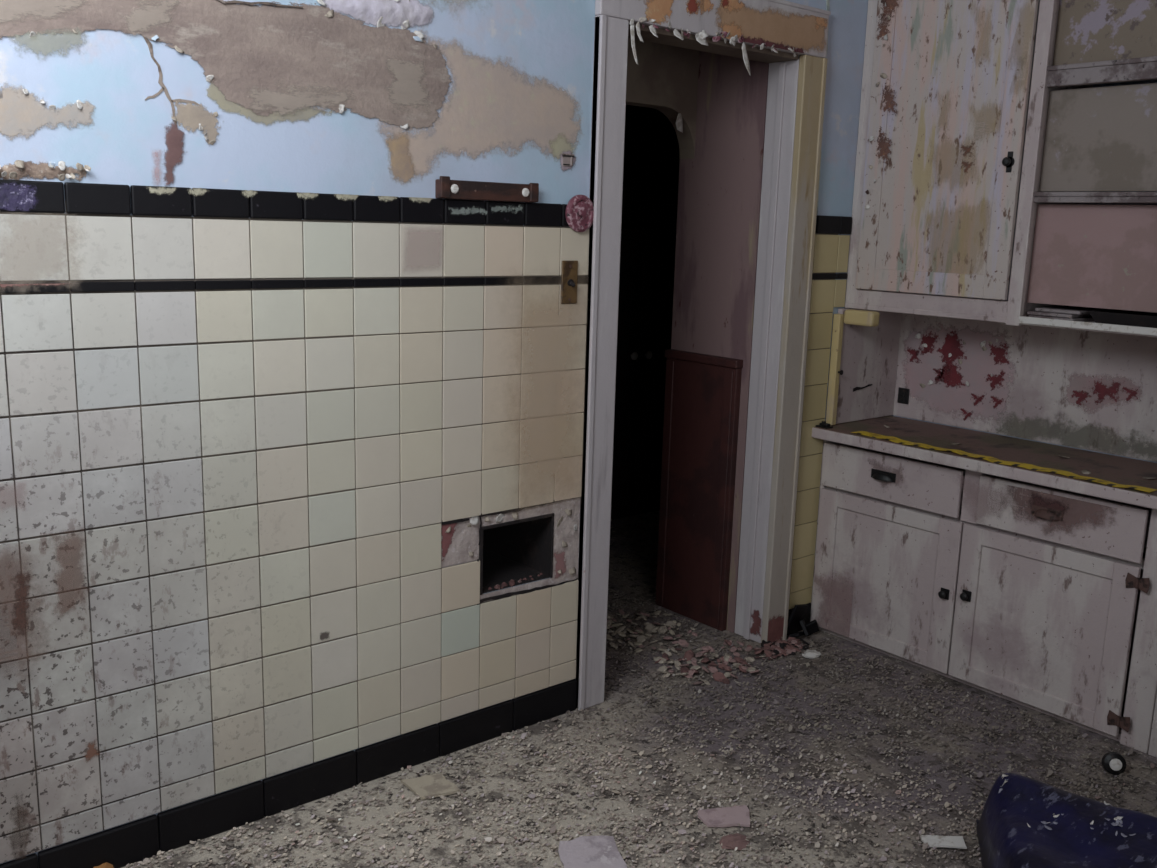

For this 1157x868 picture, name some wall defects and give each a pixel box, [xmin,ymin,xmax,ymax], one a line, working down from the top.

peeling [0,86,95,140]
crack [143,37,199,125]
peeling [171,100,221,145]
peeling [0,0,452,129]
peeling [630,0,828,75]
peeling [876,0,900,46]
peeling [0,160,91,181]
peeling [864,127,895,209]
peeling [903,322,1016,421]
peeling [1067,374,1141,411]
spalling [441,497,580,603]
spalling [750,604,819,642]